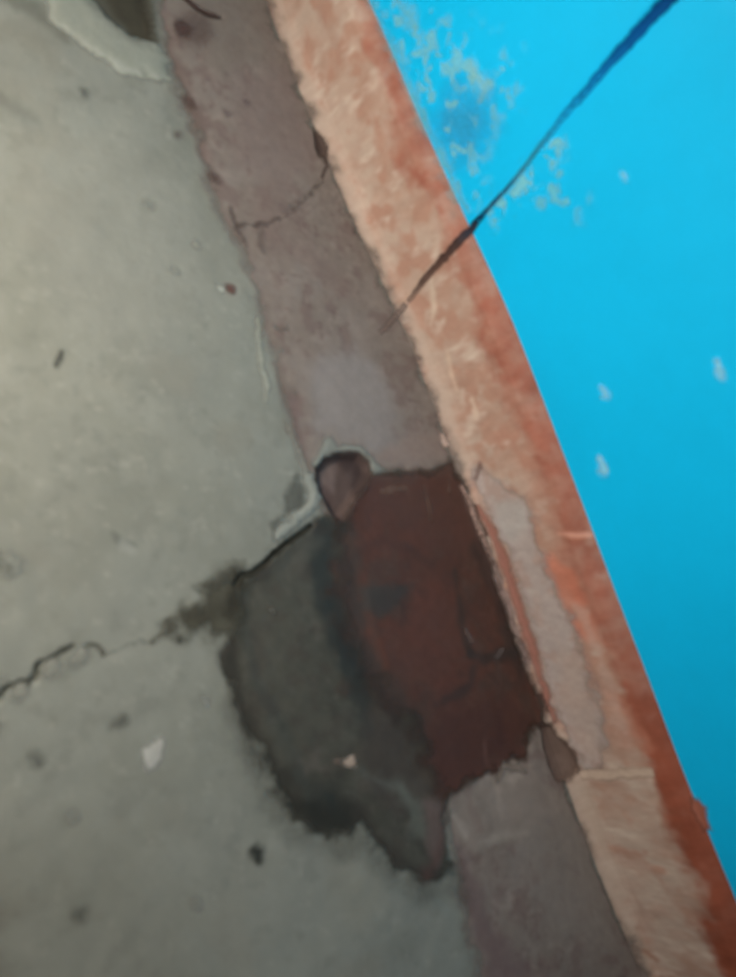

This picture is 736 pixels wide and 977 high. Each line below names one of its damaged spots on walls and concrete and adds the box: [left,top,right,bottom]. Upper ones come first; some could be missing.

peeling [394,12,492,109]
crack [230,185,319,243]
peeling [314,130,328,179]
peeling [497,172,532,208]
crack [378,0,678,335]
peeling [537,139,569,206]
leakage [157,566,245,643]
crack [0,644,104,699]
spalling [218,460,608,883]